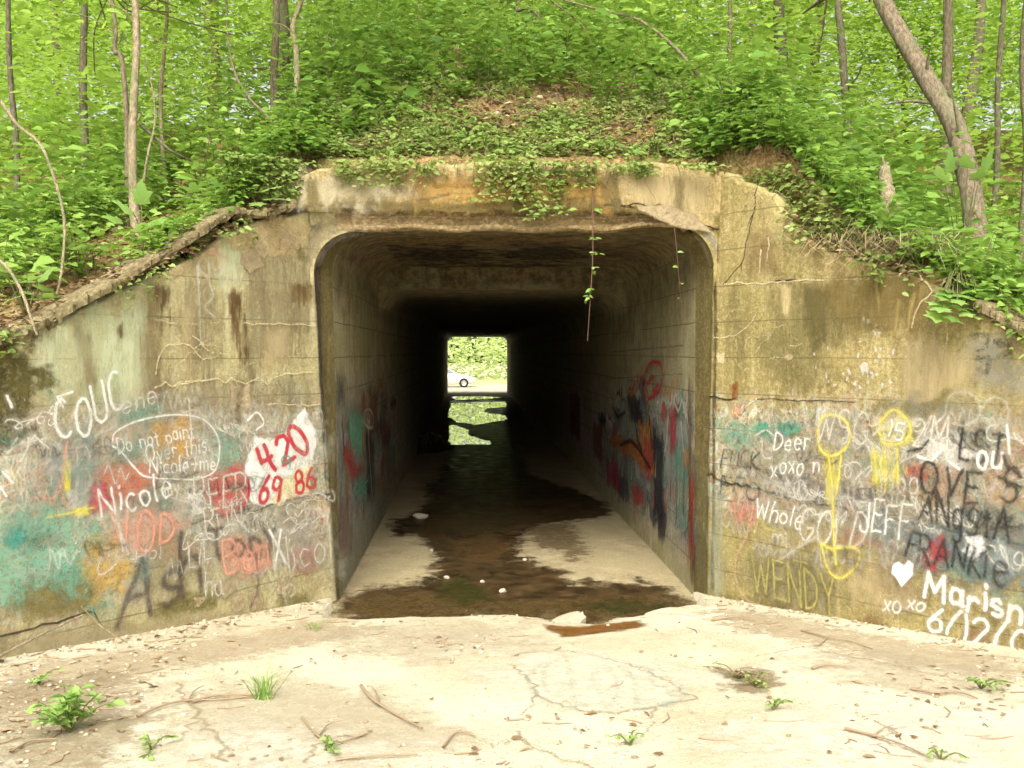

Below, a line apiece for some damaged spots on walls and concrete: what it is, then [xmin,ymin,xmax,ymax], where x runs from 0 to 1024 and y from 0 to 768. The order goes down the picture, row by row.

spalling [636,204,711,232]
crack [713,179,802,359]
rust [229,290,249,357]
crack [513,650,695,731]
crack [518,731,594,768]